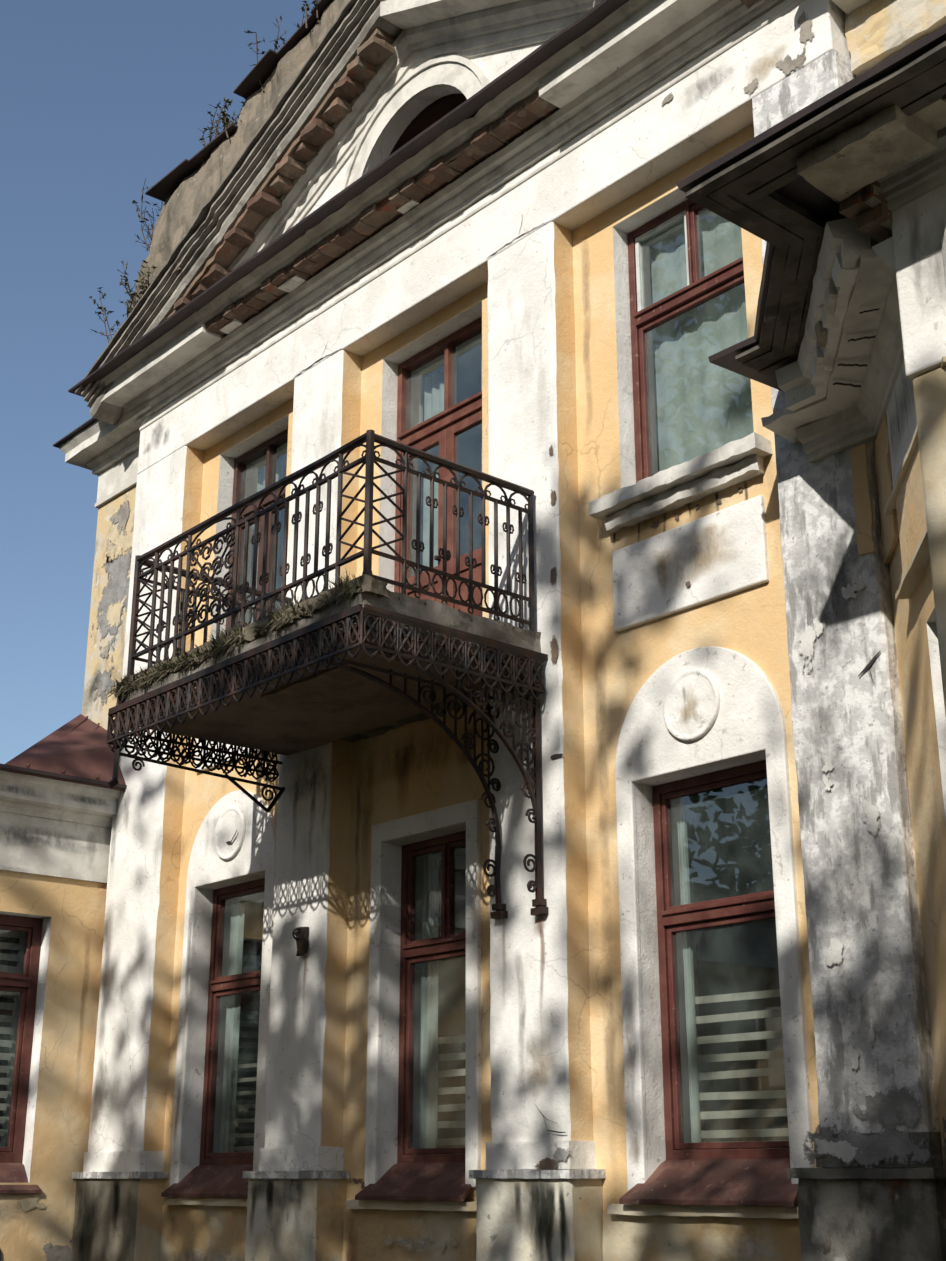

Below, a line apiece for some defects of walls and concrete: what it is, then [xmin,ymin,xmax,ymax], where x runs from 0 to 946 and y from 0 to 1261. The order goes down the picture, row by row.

peeling [743,9,814,95]
peeling [92,500,134,705]
peeling [798,576,865,675]
peeling [822,759,834,791]
peeling [825,937,843,966]
peeling [851,1087,922,1131]
peeling [814,1138,862,1164]
damp [77,1192,94,1252]
damp [252,1179,276,1210]
damp [515,1185,565,1261]